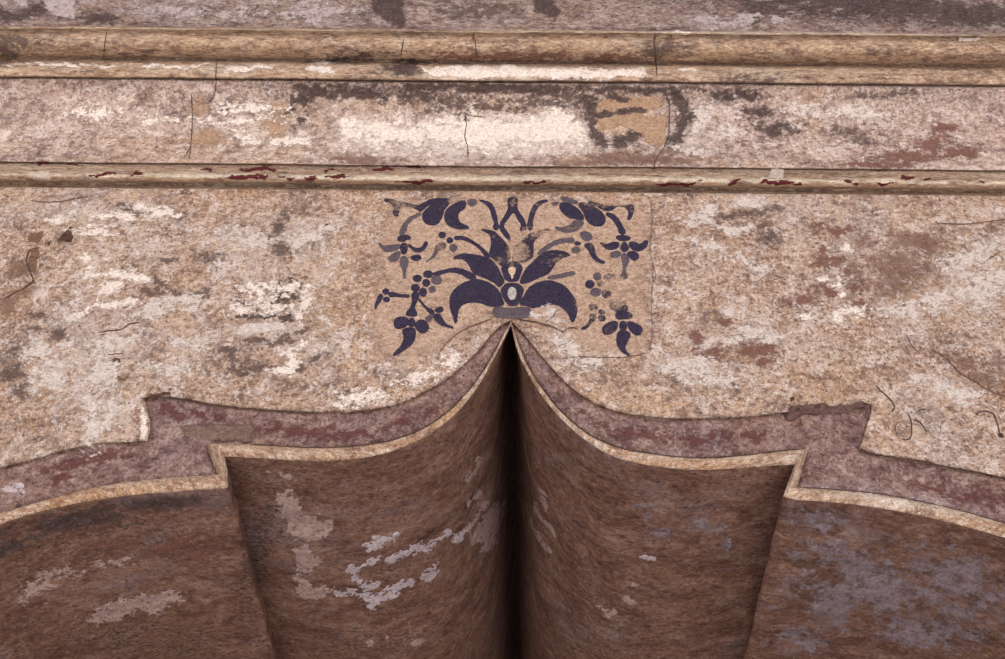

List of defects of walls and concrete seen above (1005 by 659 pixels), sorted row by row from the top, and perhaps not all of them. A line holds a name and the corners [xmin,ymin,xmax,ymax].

crack [184,64,217,158]
peeling [227,165,349,181]
water stain [553,87,710,168]
crack [654,35,673,169]
crack [4,247,40,299]
crack [906,335,1005,434]
crack [803,385,1005,523]
peeling [262,454,506,610]
peeling [86,584,187,627]